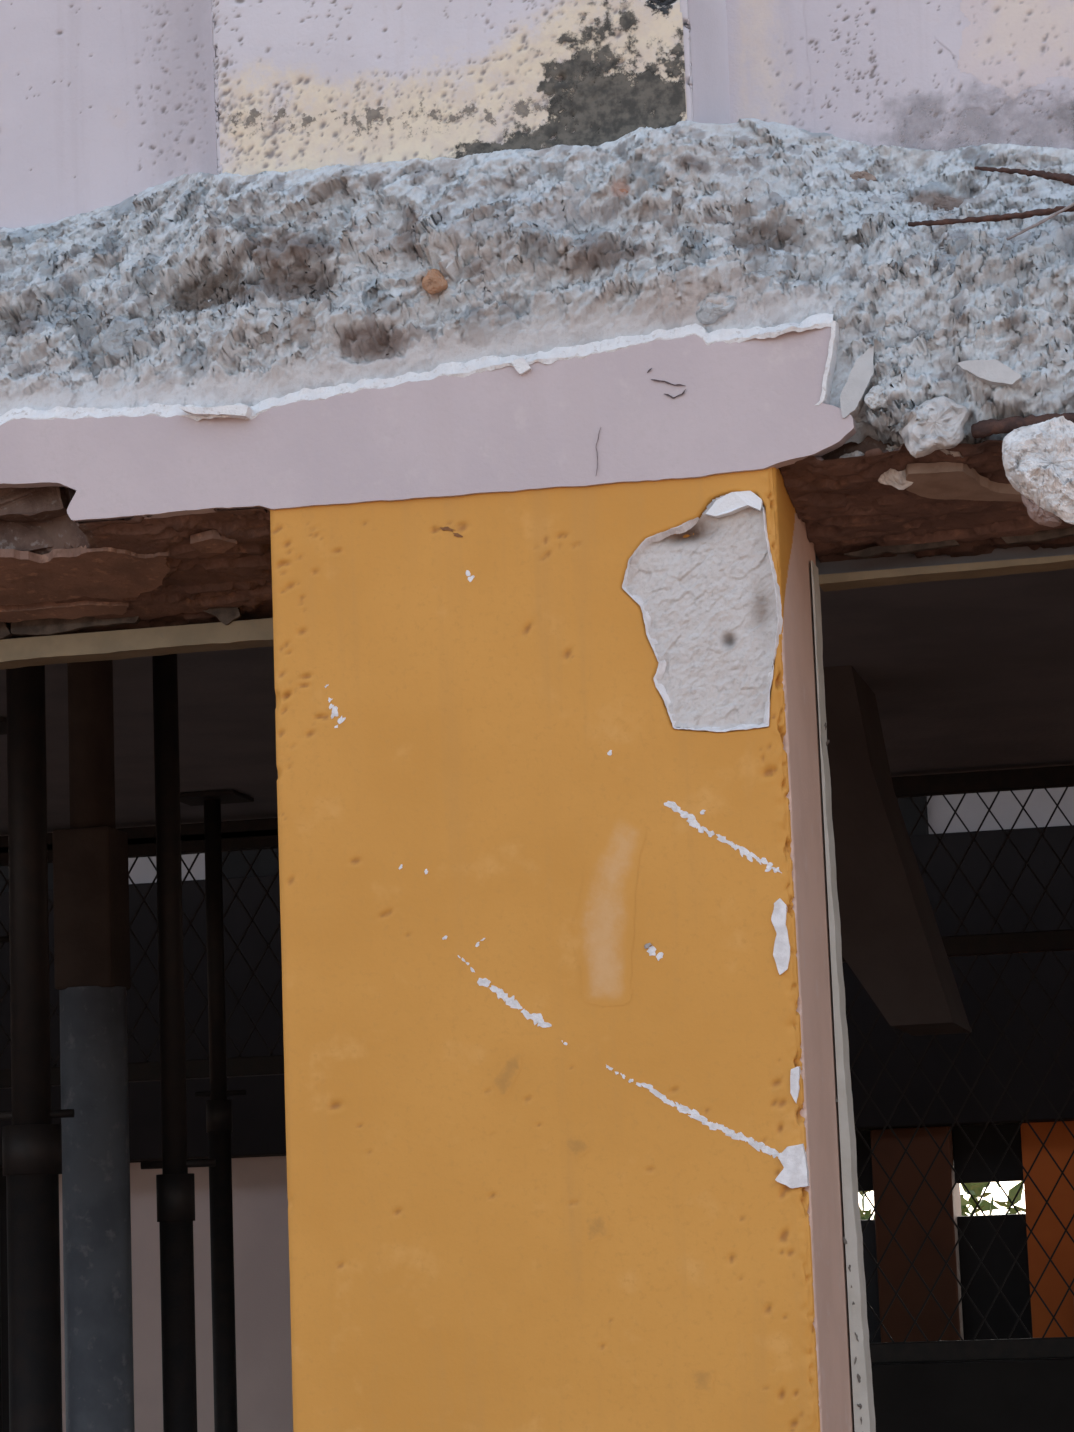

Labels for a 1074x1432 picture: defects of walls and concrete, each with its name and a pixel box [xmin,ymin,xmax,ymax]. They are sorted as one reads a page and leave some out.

damp [120,0,316,198]
damp [331,0,686,159]
spalling [0,0,1074,502]
peeling [190,530,237,553]
peeling [0,545,170,640]
peeling [204,607,242,625]
spalling [622,491,783,733]
peeling [664,801,782,873]
peeling [458,938,552,1028]
peeling [771,898,790,975]
spalling [606,1065,810,1188]